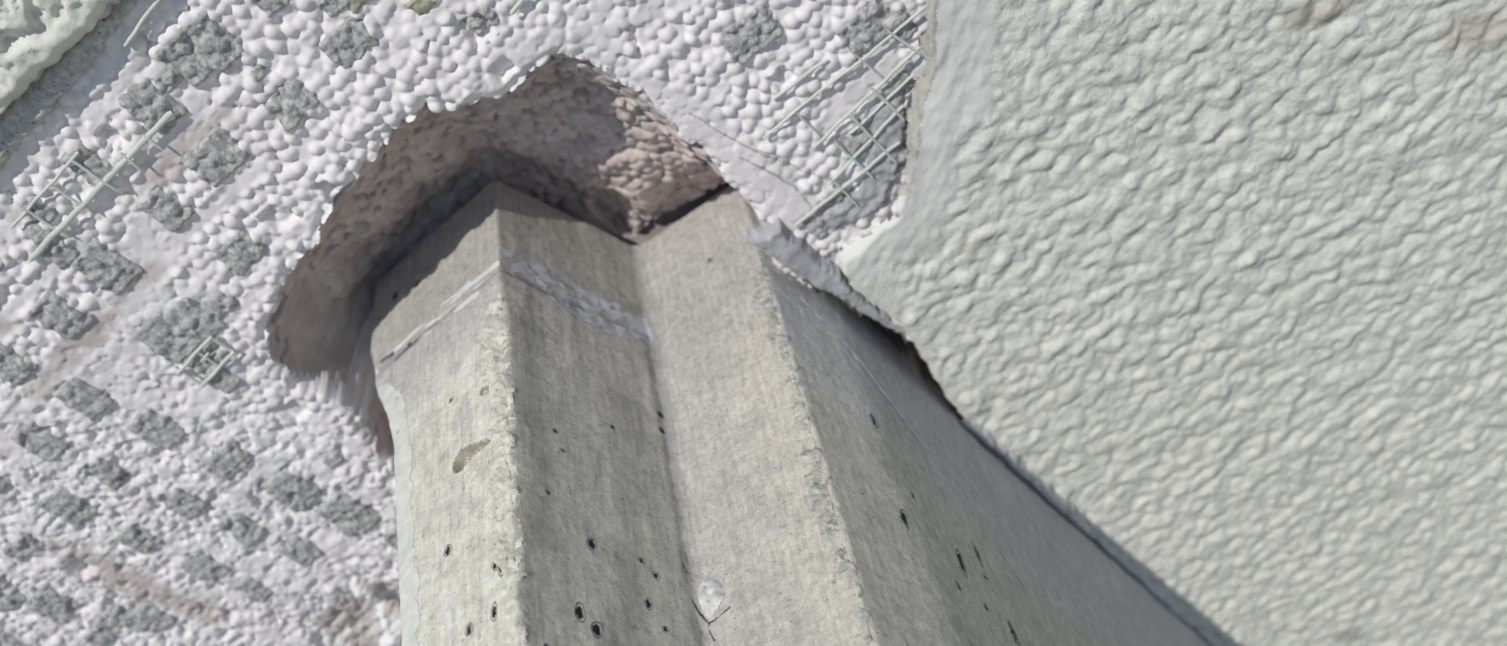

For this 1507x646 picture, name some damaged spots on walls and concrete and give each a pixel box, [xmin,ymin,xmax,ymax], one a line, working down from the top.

spalling [265,52,764,390]
spalling [897,0,939,196]
peeling [316,383,420,646]
spalling [452,287,529,646]
spalling [750,249,878,646]